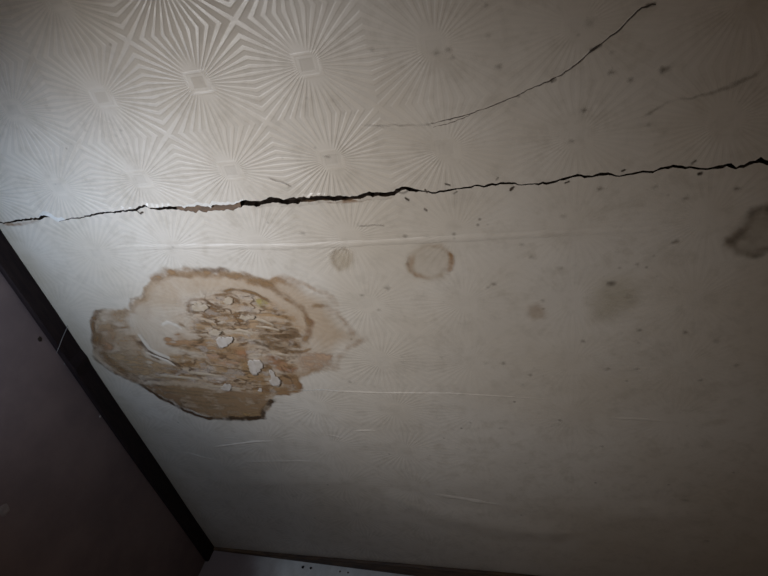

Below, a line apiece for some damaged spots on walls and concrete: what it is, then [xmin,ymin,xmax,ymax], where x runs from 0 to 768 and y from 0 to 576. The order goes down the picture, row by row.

crack [431,2,656,127]
crack [0,157,768,225]
leakage [91,268,332,421]